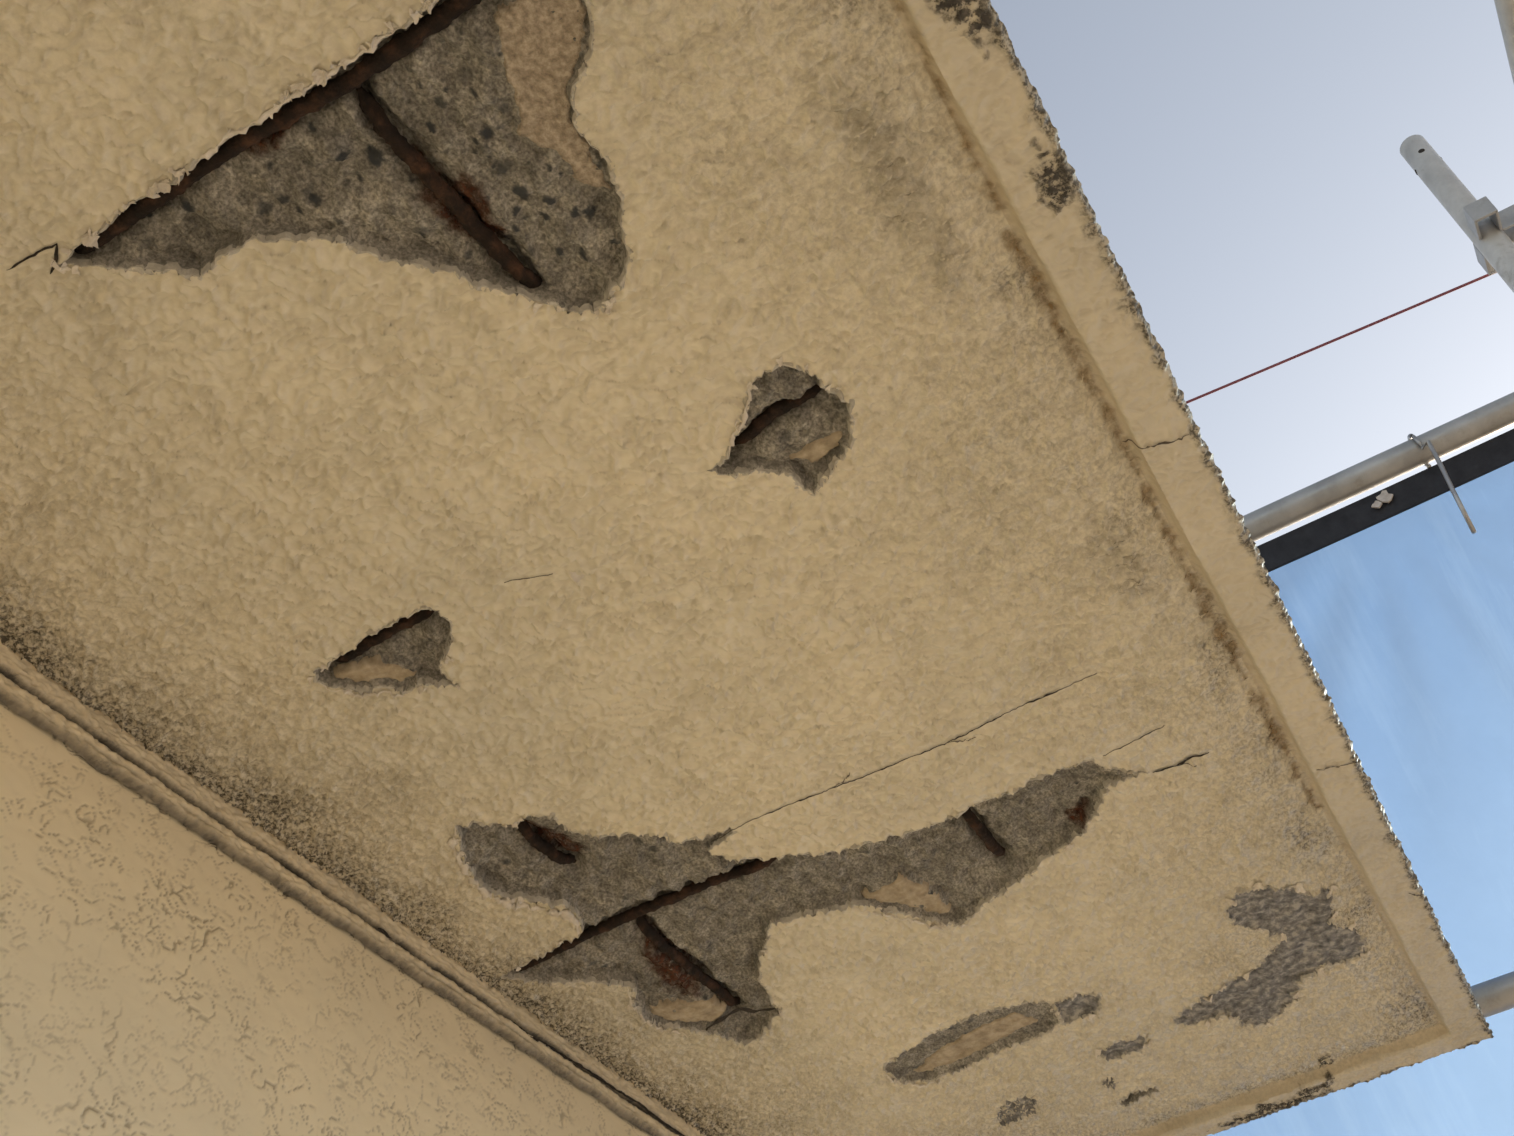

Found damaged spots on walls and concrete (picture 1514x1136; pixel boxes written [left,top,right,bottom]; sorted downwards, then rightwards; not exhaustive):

spalling [50,0,634,315]
rust [414,147,506,238]
spalling [707,357,857,496]
spalling [307,605,460,699]
rust [526,820,585,853]
spalling [447,759,1150,1046]
rust [638,914,704,996]
peeling [1172,882,1371,1029]
spalling [883,991,1103,1088]